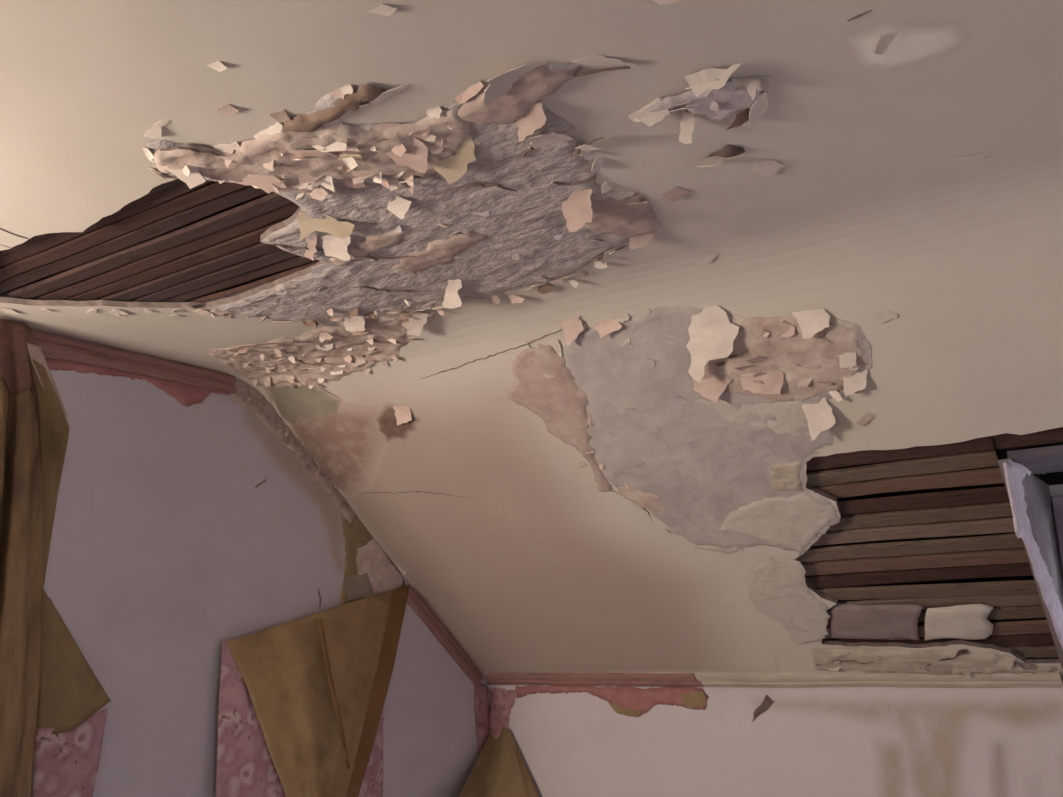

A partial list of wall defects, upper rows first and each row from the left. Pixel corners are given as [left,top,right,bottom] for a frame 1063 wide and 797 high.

peeling [628,63,771,144]
peeling [0,55,661,389]
crack [421,322,586,379]
peeling [376,402,421,443]
peeling [498,306,1063,678]
water stain [747,689,1063,797]